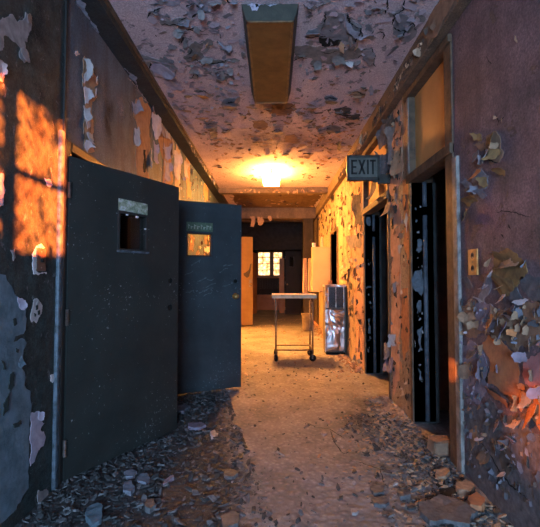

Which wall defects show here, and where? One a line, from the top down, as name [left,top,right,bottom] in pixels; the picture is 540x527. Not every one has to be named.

peeling [0,12,32,63]
peeling [75,51,98,153]
peeling [124,68,215,201]
peeling [141,0,454,400]
peeling [460,131,505,221]
peeling [0,274,46,524]
flaking render [456,248,540,527]